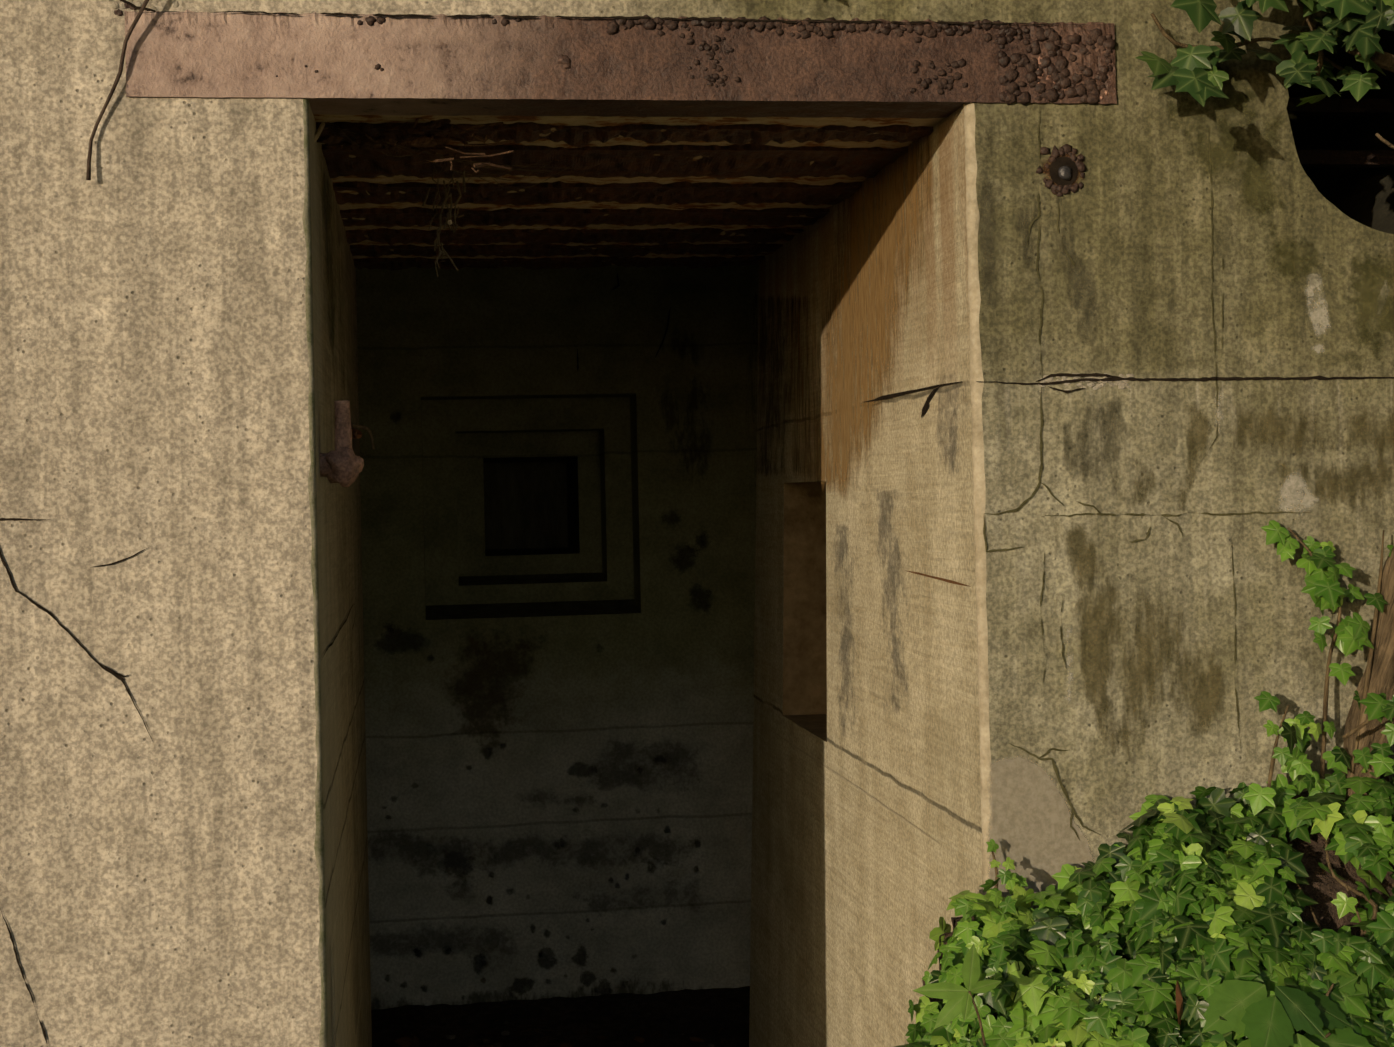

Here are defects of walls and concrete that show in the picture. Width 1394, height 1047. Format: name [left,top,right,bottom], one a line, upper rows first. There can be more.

spalling [107,0,185,16]
leakage [979,185,995,303]
leakage [1064,402,1123,478]
crack [863,110,1394,746]
crack [0,518,153,741]
leakage [1066,528,1221,743]
crack [1009,743,1100,840]
crack [1,911,48,1046]